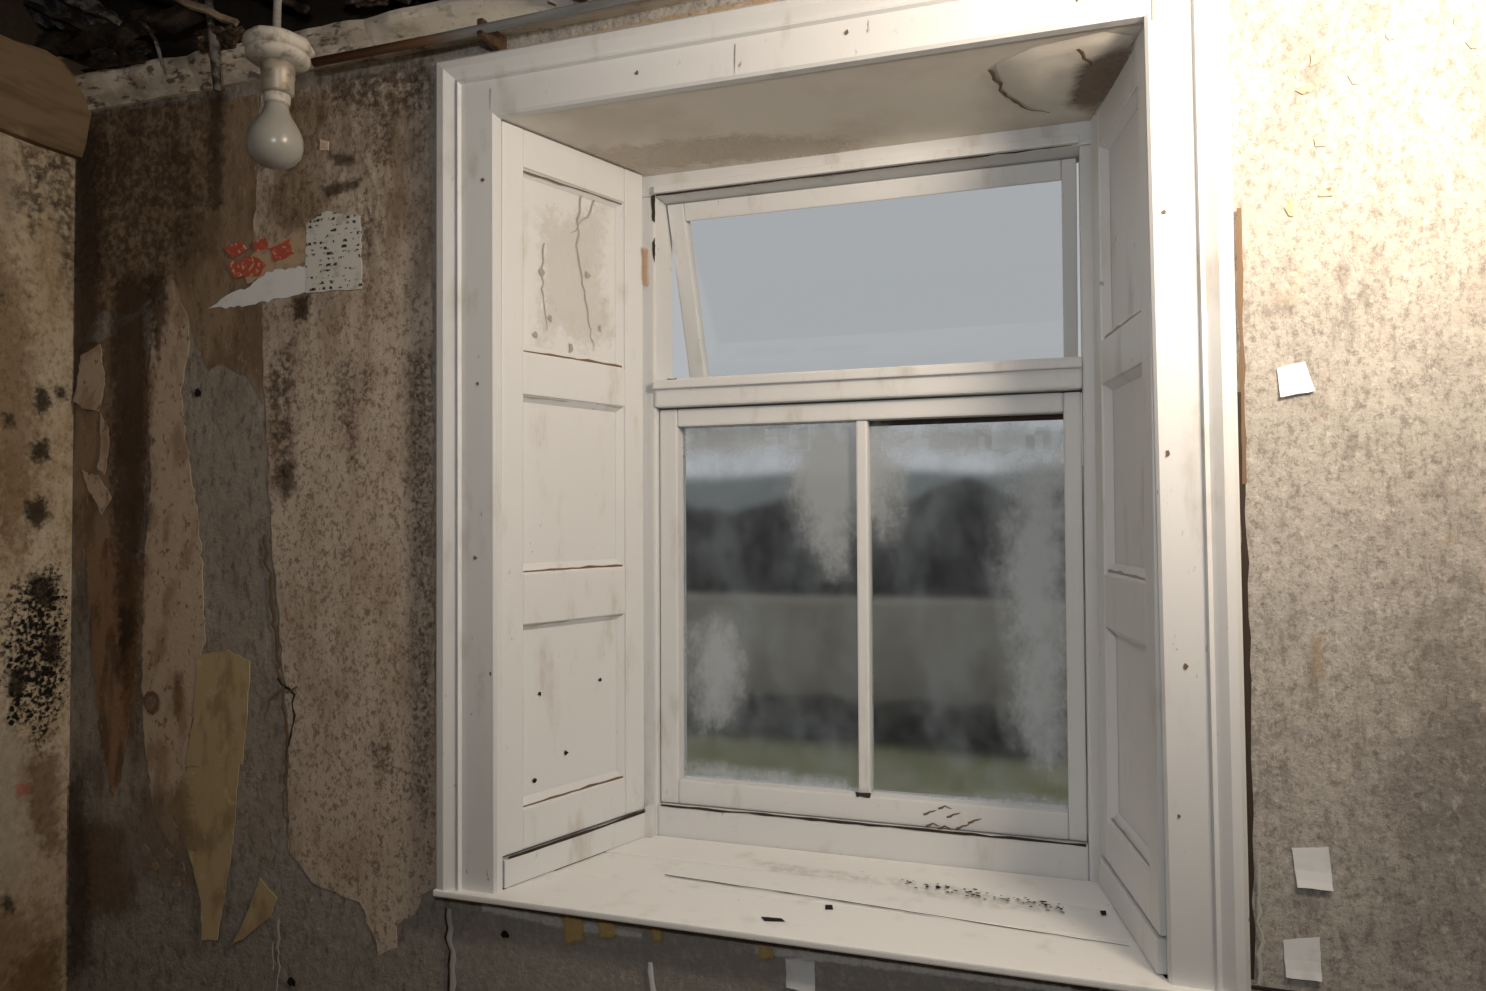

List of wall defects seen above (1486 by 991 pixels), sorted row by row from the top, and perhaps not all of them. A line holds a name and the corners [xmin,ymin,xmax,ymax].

leakage [333,66,423,166]
peeling [73,344,112,515]
leakage [11,92,224,679]
leakage [0,566,67,756]
peeling [170,764,240,941]